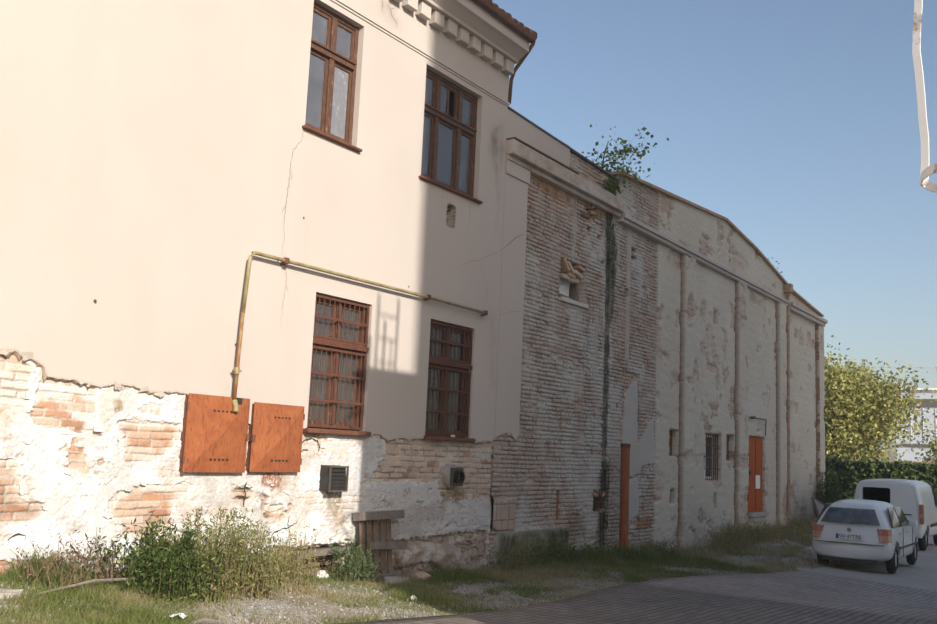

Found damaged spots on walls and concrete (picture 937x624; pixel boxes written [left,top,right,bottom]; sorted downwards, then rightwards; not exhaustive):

spalling [0,458,49,526]
spalling [0,347,185,480]
spalling [102,480,195,543]
spalling [231,440,298,525]
spalling [301,433,325,459]
spalling [360,433,494,502]
spalling [0,549,84,577]